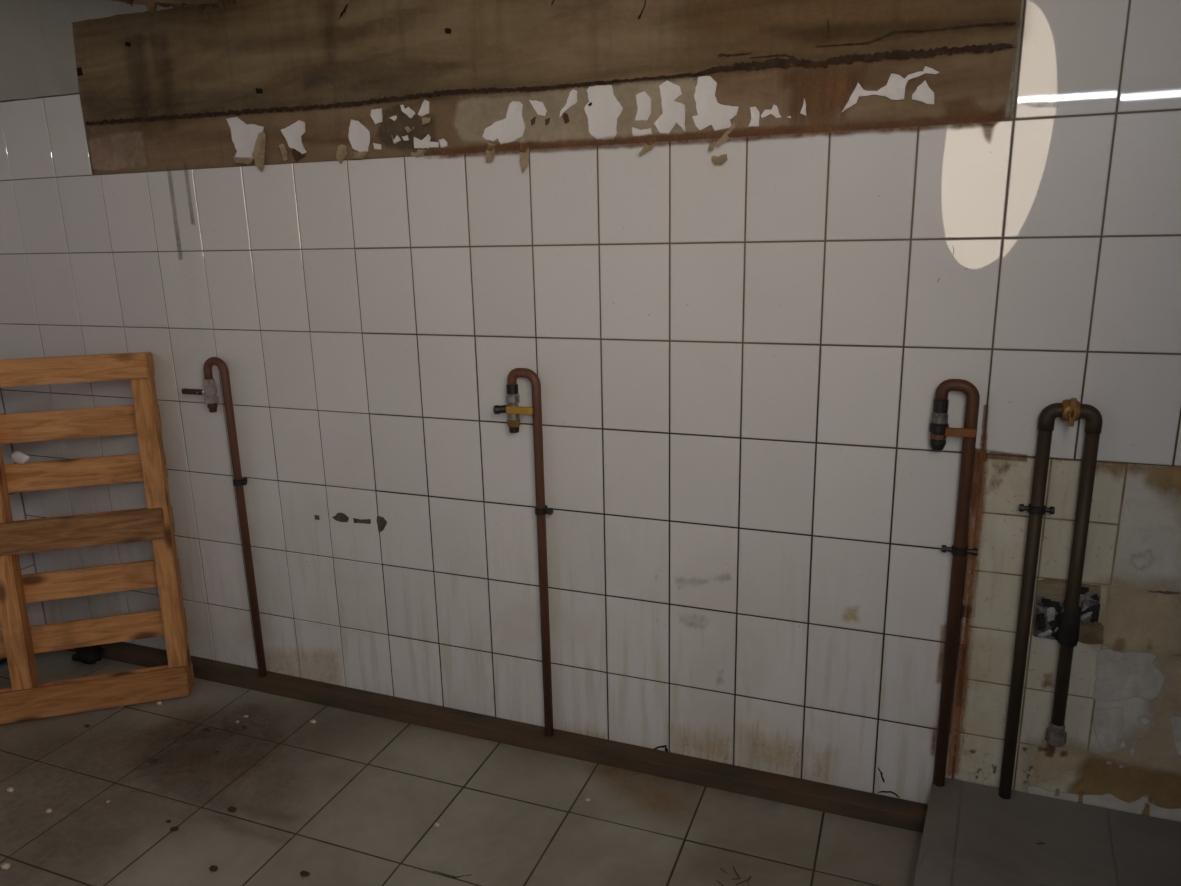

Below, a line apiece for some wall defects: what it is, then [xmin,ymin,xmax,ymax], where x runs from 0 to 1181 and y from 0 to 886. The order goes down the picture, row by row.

rust [948,405,1027,776]
peeling [1033,579,1164,700]